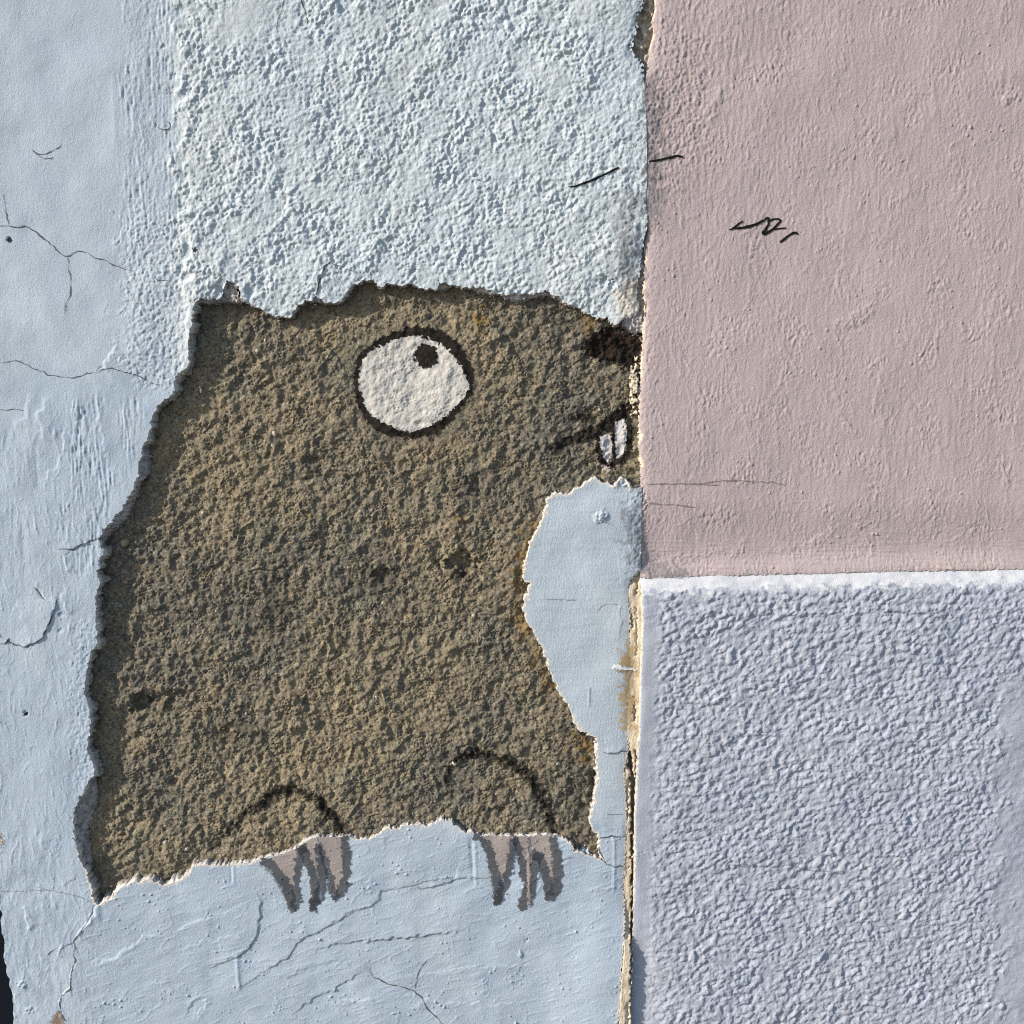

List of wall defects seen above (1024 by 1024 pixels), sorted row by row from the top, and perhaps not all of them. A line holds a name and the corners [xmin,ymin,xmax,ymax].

crack [3,195,168,313]
crack [5,588,58,647]
spalling [72,279,644,905]
crack [211,877,516,987]
crack [369,933,449,1023]